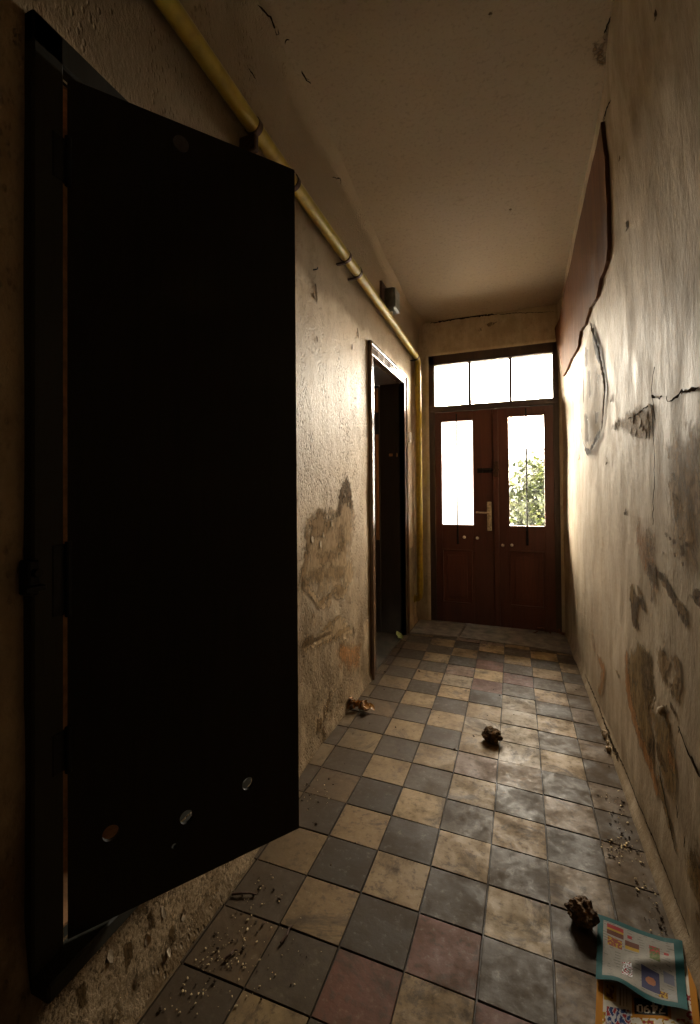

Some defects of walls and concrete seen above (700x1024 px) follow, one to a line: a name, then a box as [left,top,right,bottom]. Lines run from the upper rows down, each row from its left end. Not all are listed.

spalling [611,403,653,440]
crack [628,367,699,521]
water stain [625,423,700,797]